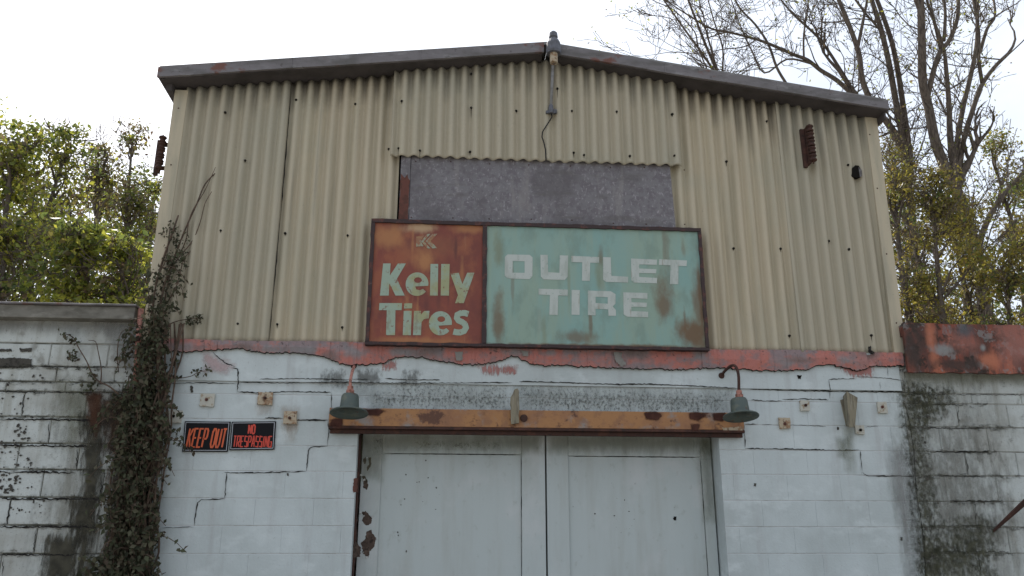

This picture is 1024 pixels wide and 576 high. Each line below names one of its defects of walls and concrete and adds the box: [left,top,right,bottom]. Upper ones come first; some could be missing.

leakage [0,364,158,576]
crack [166,352,728,528]
peeling [478,365,516,376]
corrosion [644,411,662,420]
corrosion [689,412,725,431]
leakage [901,383,1022,576]